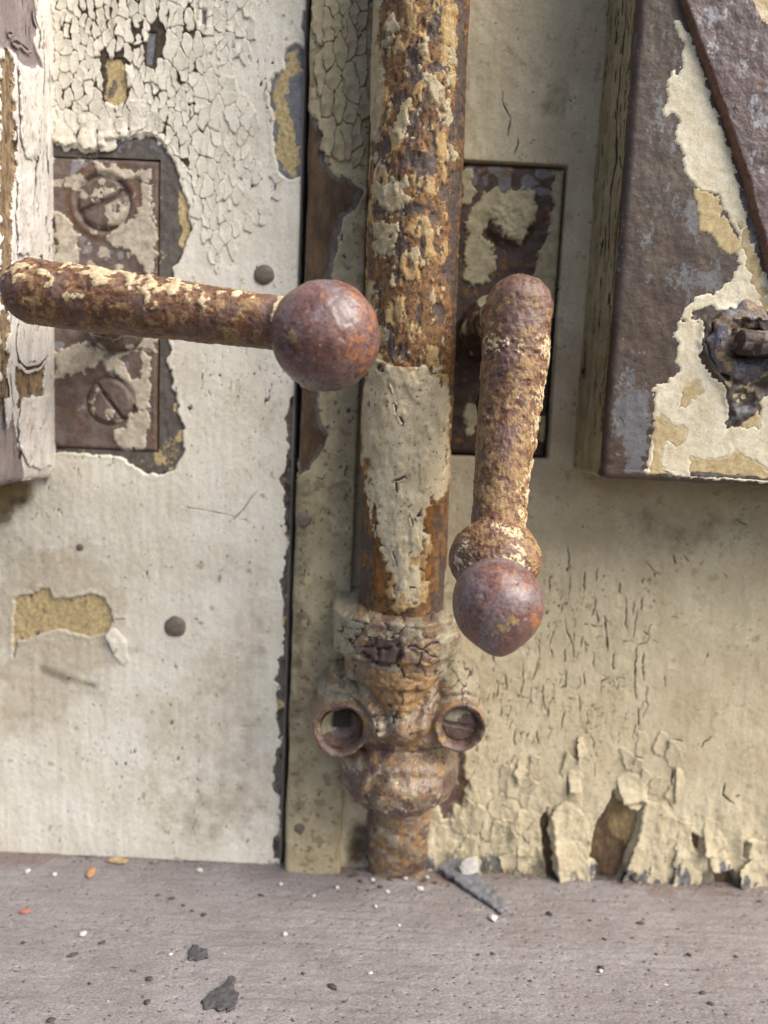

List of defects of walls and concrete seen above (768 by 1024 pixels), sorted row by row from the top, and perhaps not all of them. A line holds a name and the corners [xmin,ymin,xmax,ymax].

crack [7,0,283,274]
crack [310,0,370,168]
peeling [269,44,415,283]
peeling [381,12,402,49]
peeling [417,34,459,162]
peeling [643,20,768,484]
peeling [360,358,452,614]
corrosion [423,501,435,579]
peeling [12,588,129,667]
crack [450,544,727,875]
corrosion [349,825,369,863]
peeling [540,737,768,890]